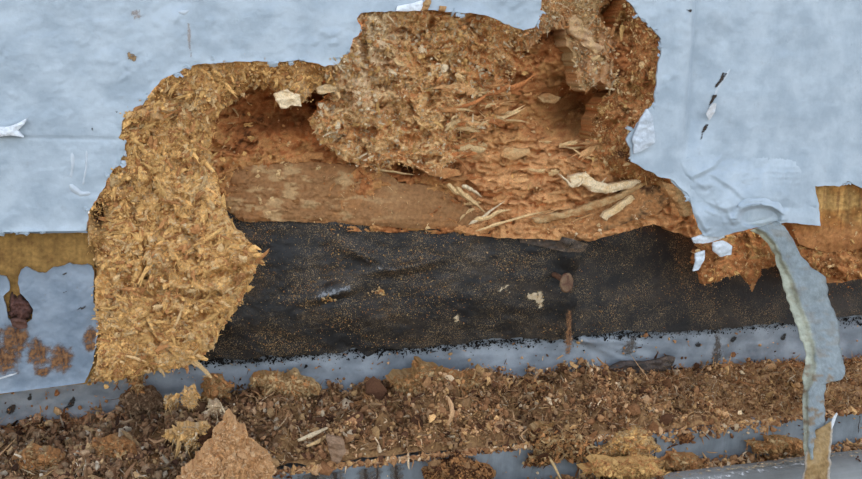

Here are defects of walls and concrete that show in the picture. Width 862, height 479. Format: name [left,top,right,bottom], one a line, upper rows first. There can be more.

spalling [83,0,702,386]
rust [565,311,573,354]
peeling [690,181,862,479]